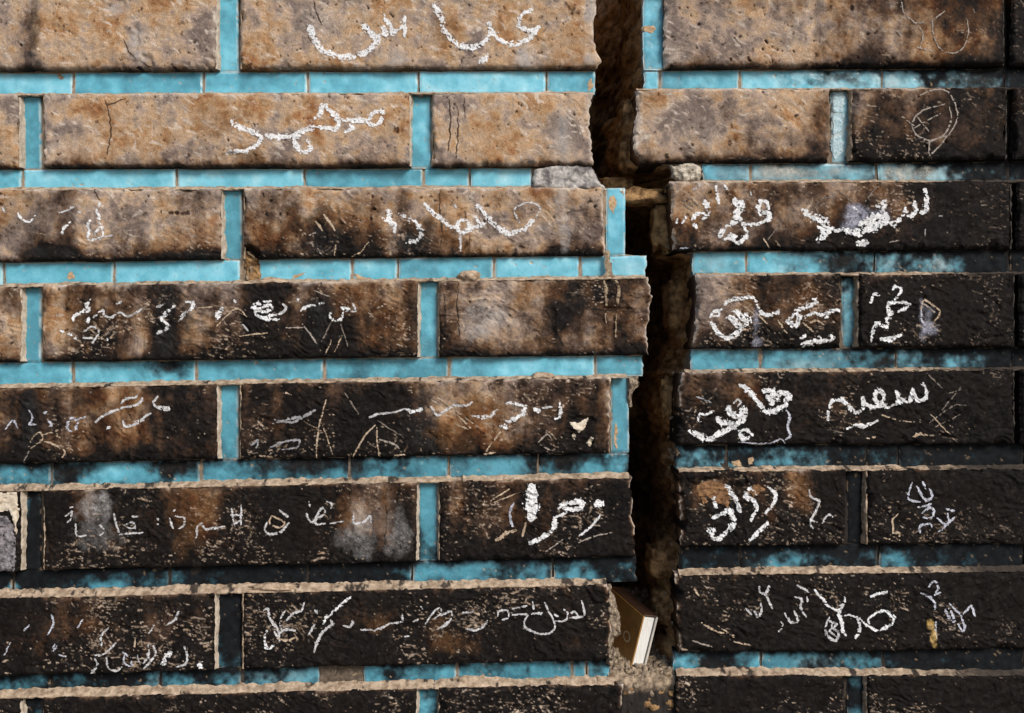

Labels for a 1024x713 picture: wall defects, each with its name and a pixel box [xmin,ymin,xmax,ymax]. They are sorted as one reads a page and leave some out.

crack [104,98,127,155]
crack [448,98,466,158]
crack [543,0,692,663]